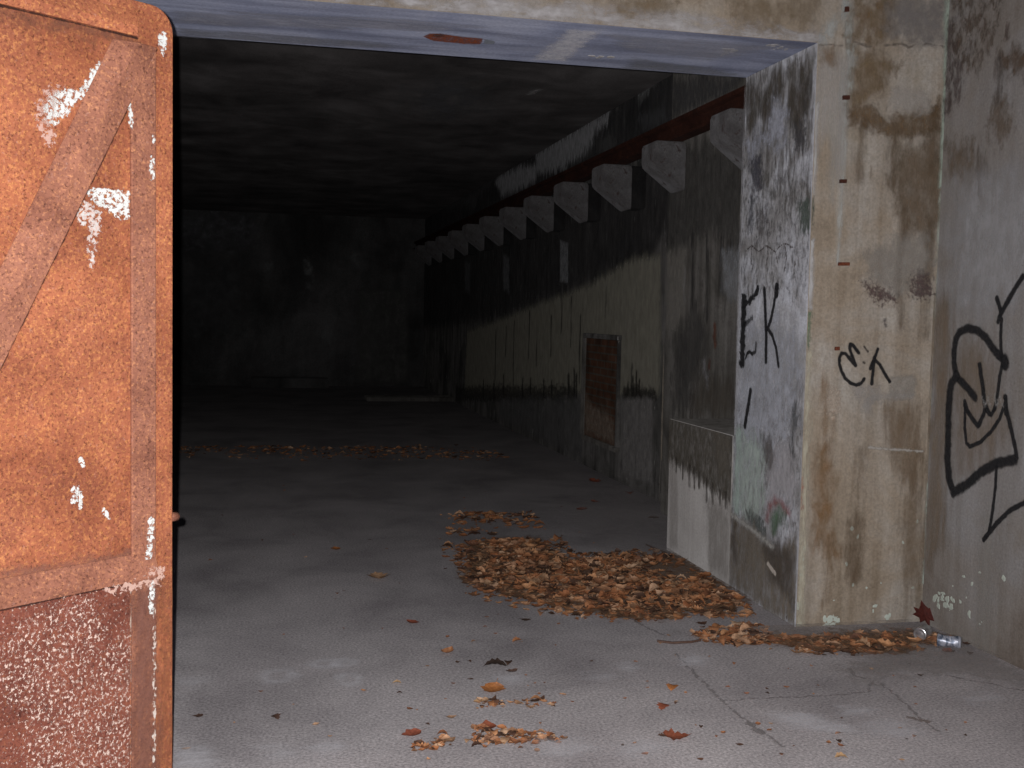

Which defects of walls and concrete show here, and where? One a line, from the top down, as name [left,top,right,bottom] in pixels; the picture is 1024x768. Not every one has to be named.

corrosion [424,33,483,44]
leakage [779,77,810,151]
leakage [818,0,1011,244]
leakage [799,198,810,233]
leakage [623,142,767,470]
leakage [676,429,796,622]
crack [632,618,784,747]
crack [769,668,939,732]